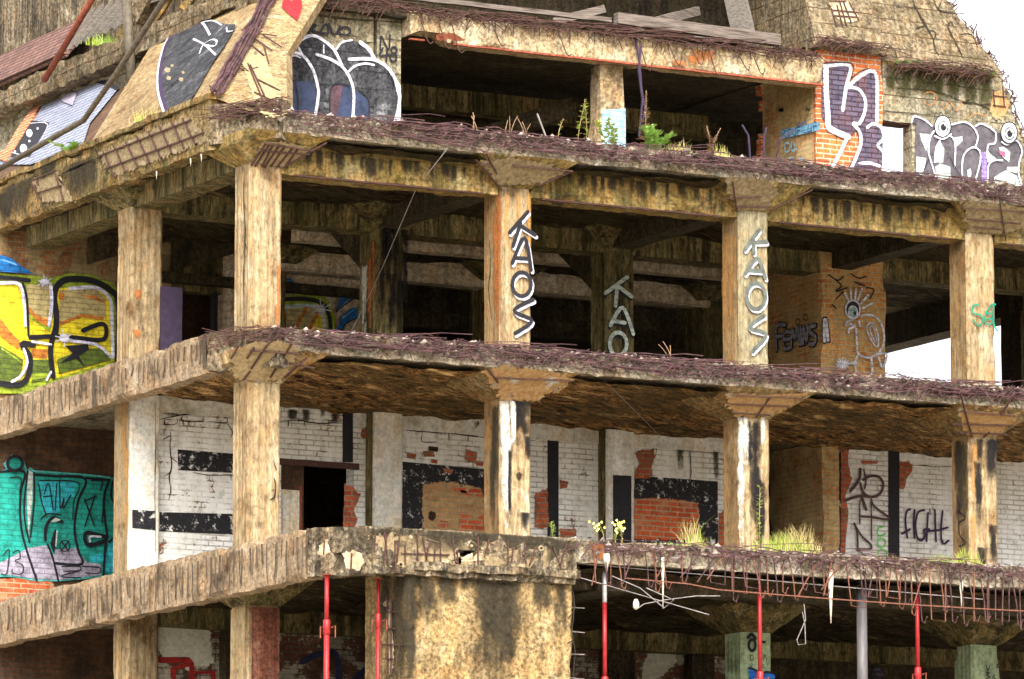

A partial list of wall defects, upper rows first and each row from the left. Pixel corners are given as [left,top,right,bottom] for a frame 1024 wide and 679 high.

damp [305,151,466,180]
damp [802,196,940,228]
damp [288,409,338,423]
damp [351,379,579,570]
spalling [342,446,1024,591]
damp [738,416,765,542]
damp [954,439,999,565]
damp [380,565,521,679]
damp [533,582,568,630]